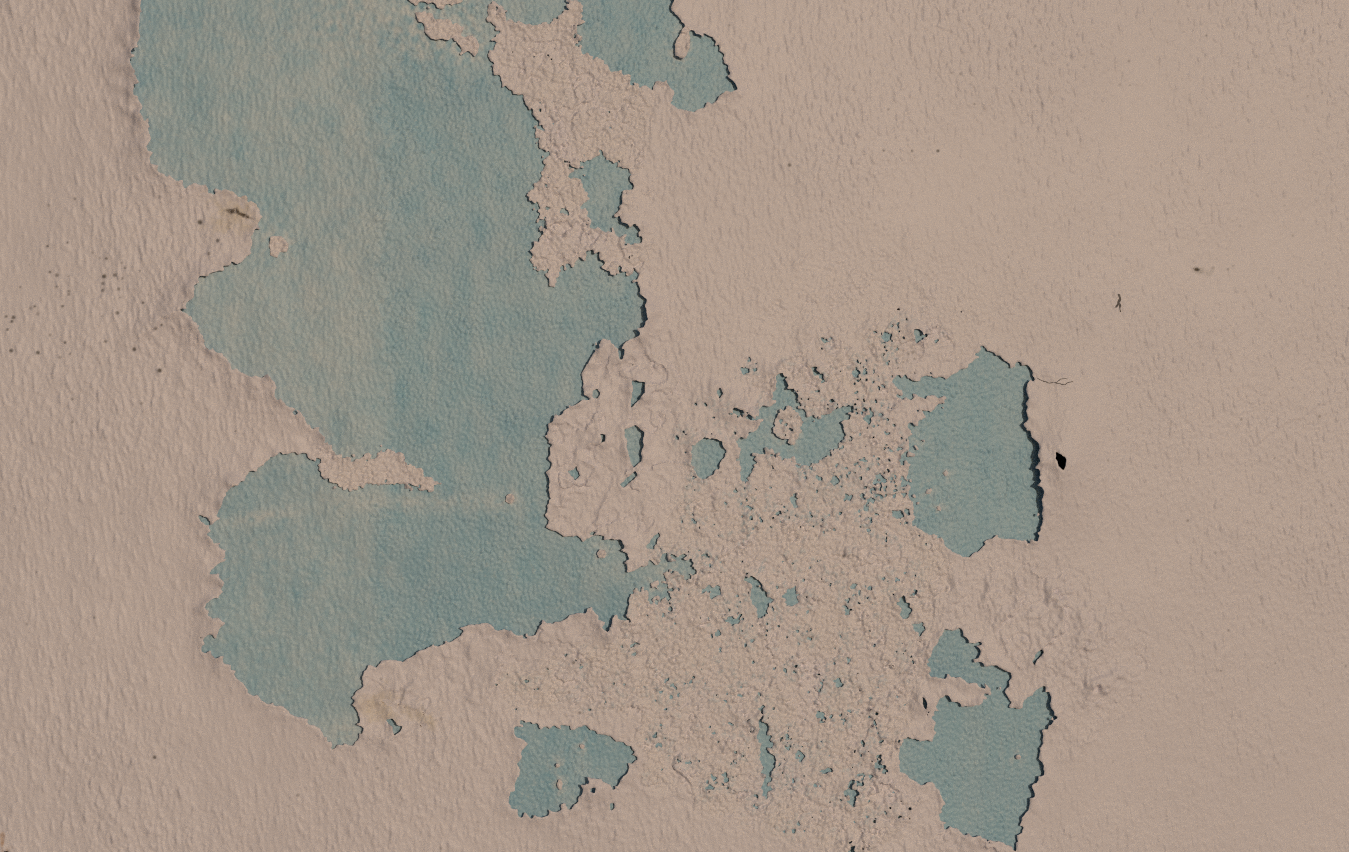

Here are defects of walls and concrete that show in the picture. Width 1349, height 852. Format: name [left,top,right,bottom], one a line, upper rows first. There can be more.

peeling [111,0,1070,852]